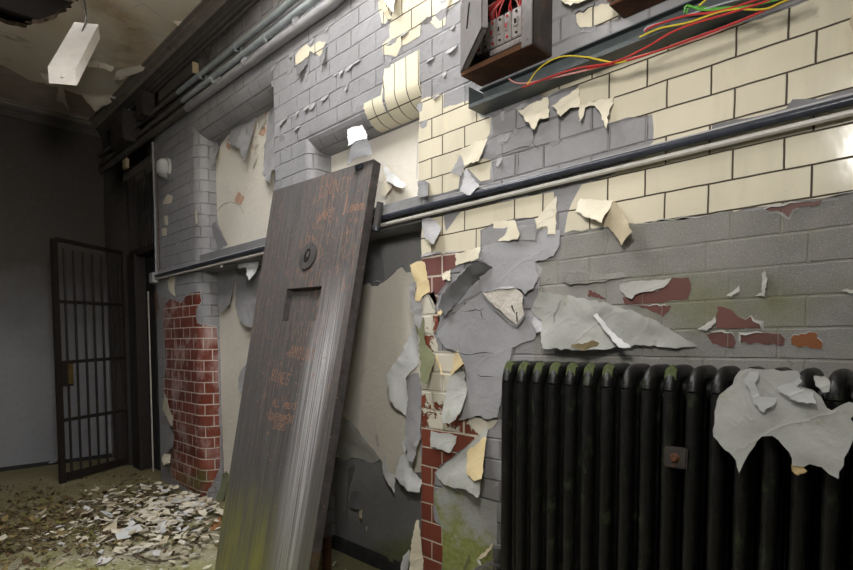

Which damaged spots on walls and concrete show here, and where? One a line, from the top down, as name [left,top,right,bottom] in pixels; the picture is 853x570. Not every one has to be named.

flaking render [0,65,116,118]
peeling [87,60,145,80]
peeling [287,28,328,82]
peeling [210,94,329,250]
peeling [155,194,181,236]
peeling [331,0,853,570]
peeling [162,260,262,502]